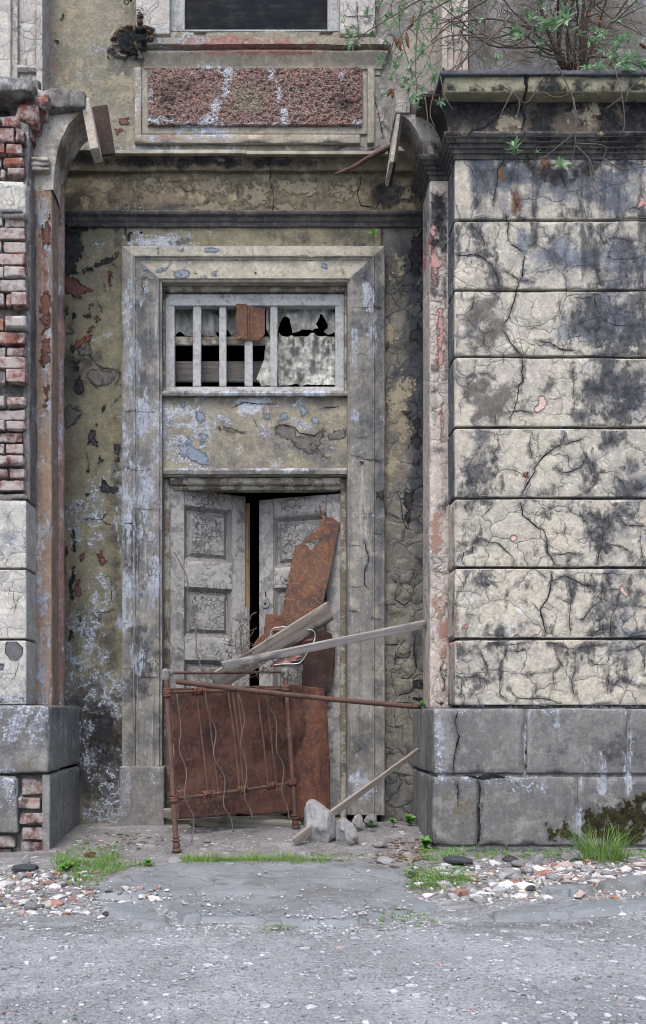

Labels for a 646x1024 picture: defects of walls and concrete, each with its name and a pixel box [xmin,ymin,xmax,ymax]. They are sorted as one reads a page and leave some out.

flaking render [0,117,27,182]
spalling [105,8,157,135]
crack [467,74,529,137]
flaking render [0,214,121,494]
leakage [430,192,507,352]
crack [432,158,641,494]
leakage [512,0,646,492]
peeling [64,529,107,603]
leakage [0,278,232,823]
crack [374,436,645,844]
leakage [541,576,616,658]
leakage [583,463,643,554]